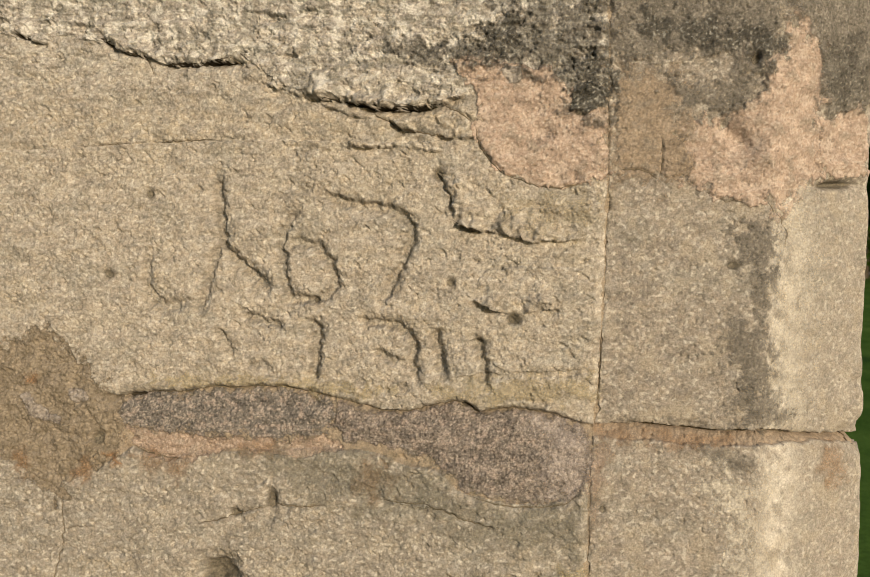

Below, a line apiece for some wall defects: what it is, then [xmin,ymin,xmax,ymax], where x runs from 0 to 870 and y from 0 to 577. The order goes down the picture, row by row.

crack [101,38,243,74]
flaking render [450,10,870,223]
spalling [0,323,596,510]
crack [28,471,93,577]